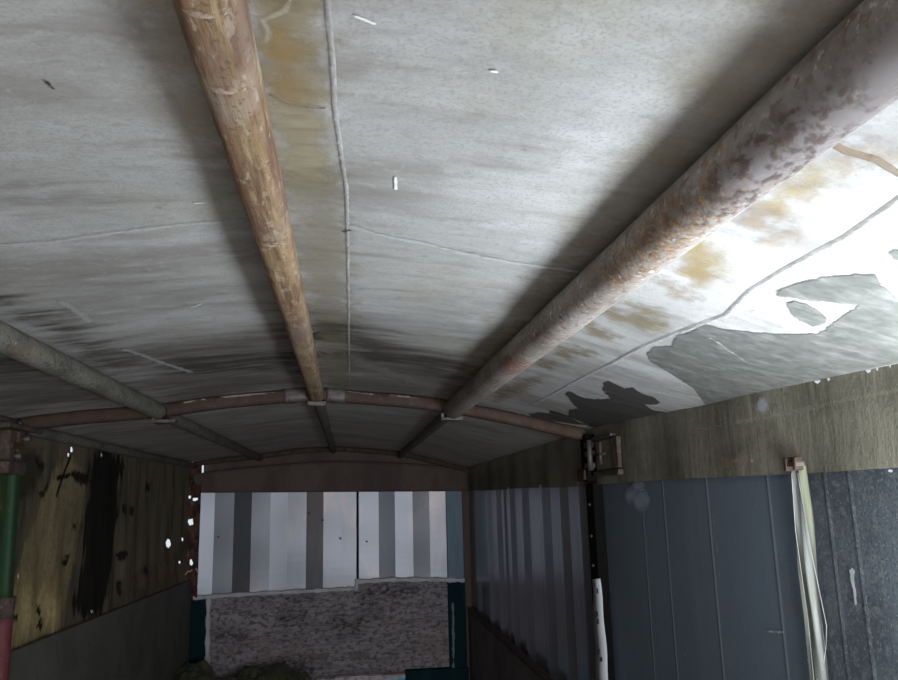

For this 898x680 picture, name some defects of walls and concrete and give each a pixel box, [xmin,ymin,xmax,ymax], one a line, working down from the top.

rust [512,86,877,329]
leakage [11,450,181,649]